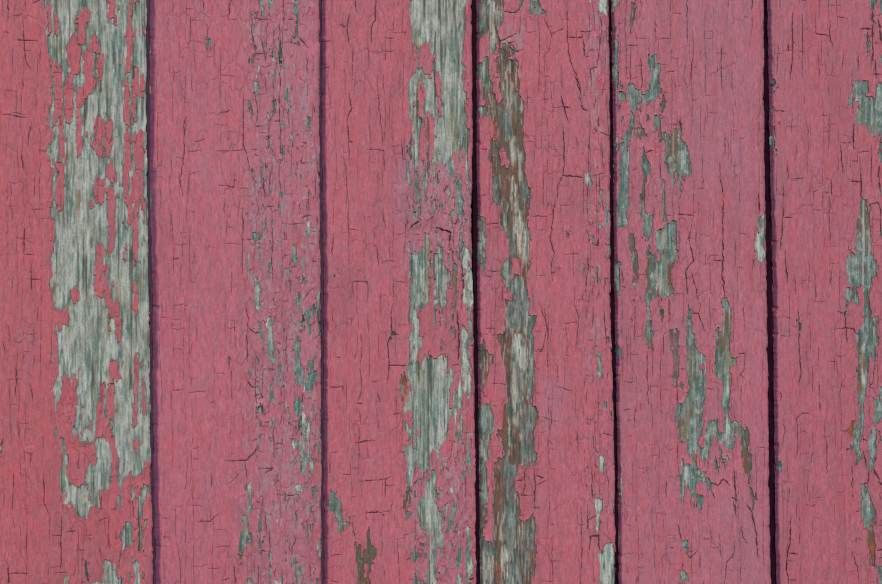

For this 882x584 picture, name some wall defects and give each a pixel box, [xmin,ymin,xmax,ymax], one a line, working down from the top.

peeling [44,0,152,584]
crack [211,421,318,584]
crack [218,0,406,556]
peeling [354,527,376,584]
crack [410,221,473,366]
peeling [399,0,538,584]
peeling [584,27,757,510]
crack [679,155,725,331]
crack [777,4,882,88]
crack [779,309,882,584]
peeling [844,197,882,470]
peeling [848,80,882,162]